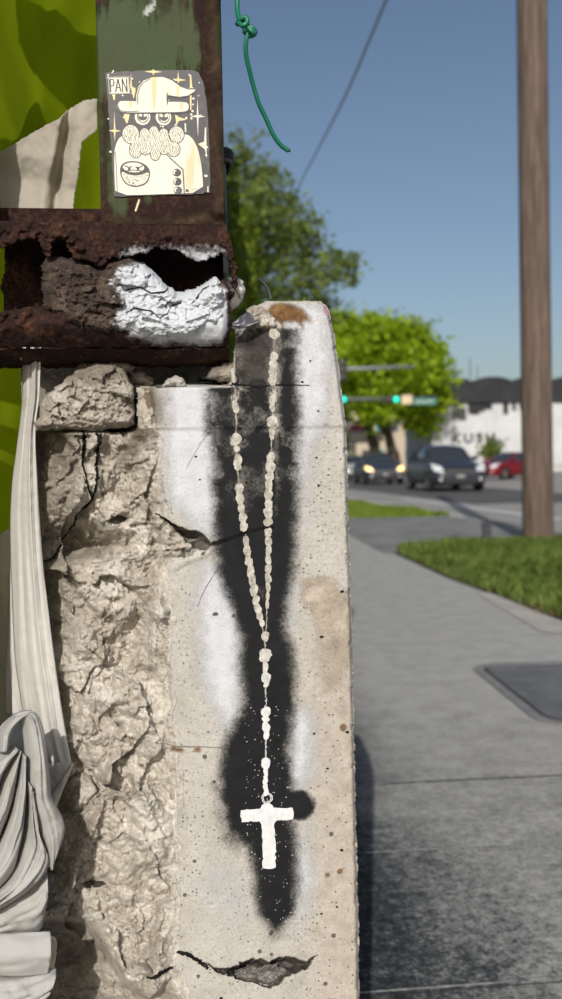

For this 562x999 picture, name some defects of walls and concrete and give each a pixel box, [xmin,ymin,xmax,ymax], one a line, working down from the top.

corrosion [100,103,109,194]
corrosion [106,0,224,225]
corrosion [268,303,308,325]
crack [43,385,138,561]
crack [155,513,181,532]
crack [198,526,274,605]
spalling [36,429,212,999]
crack [146,951,318,988]